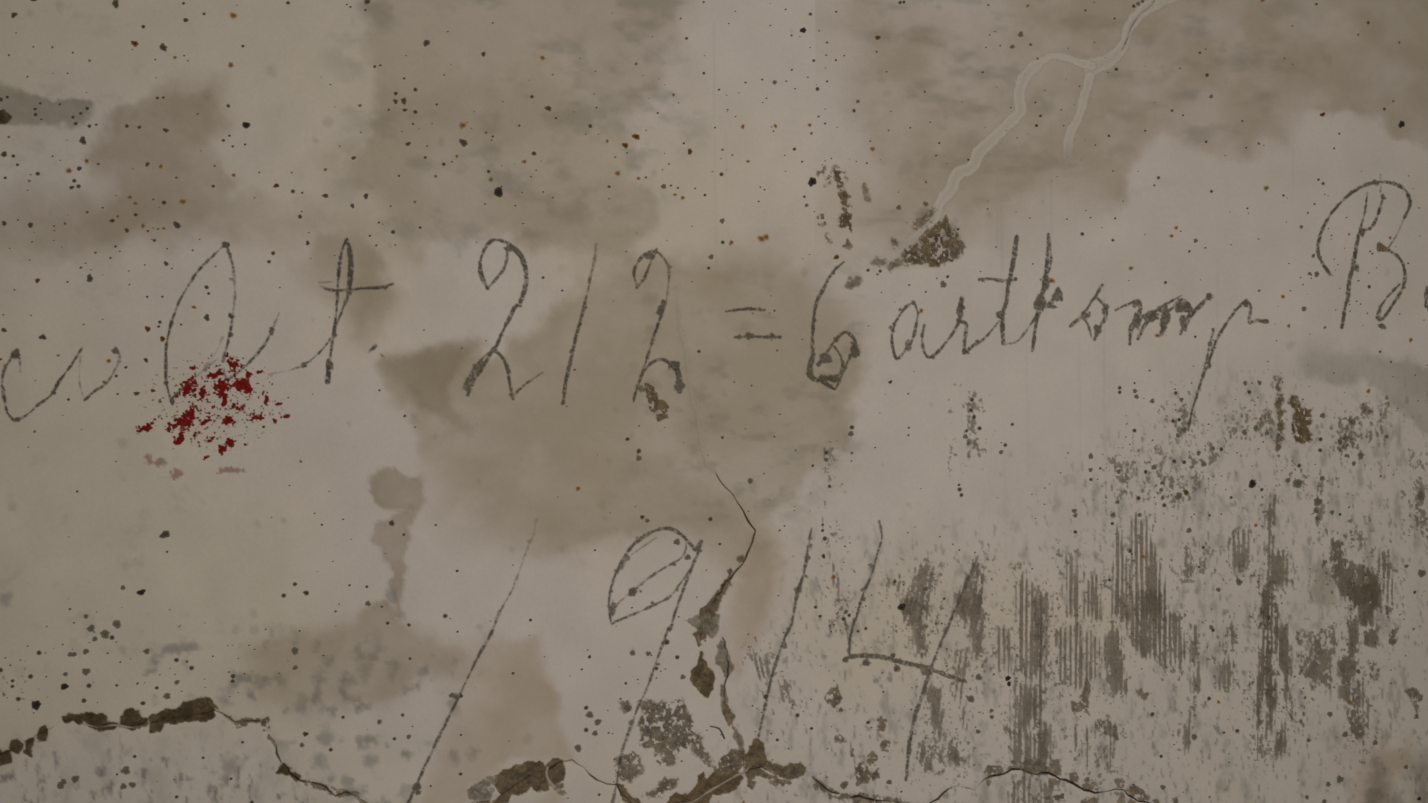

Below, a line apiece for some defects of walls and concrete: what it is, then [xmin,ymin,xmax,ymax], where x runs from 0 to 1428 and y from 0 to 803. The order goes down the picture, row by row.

crack [906,0,1178,246]
spalling [845,276,861,289]
spalling [873,202,965,287]
crack [468,372,1178,803]
crack [0,697,367,803]
spalling [615,700,713,797]